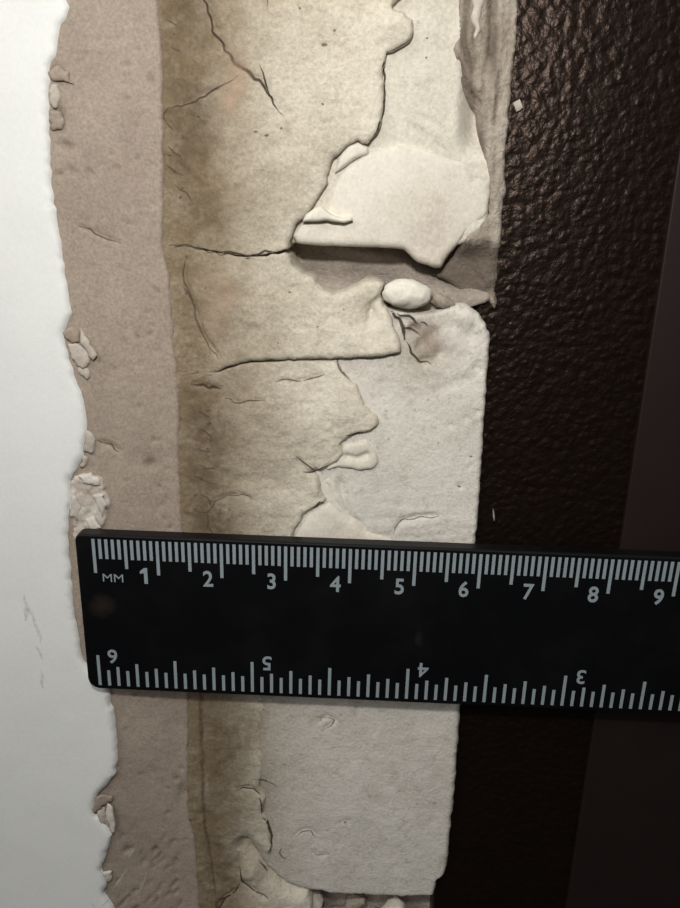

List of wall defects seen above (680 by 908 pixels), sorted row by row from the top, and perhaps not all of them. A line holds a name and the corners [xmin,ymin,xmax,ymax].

peeling [48,65,74,130]
crack [163,0,283,201]
peeling [335,142,369,173]
spalling [286,243,490,364]
peeling [63,327,97,380]
crack [193,384,260,404]
crack [275,357,365,382]
peeling [69,430,110,539]
crack [194,412,250,533]
peeling [92,794,116,833]
crack [216,779,286,908]
spalling [312,889,430,908]